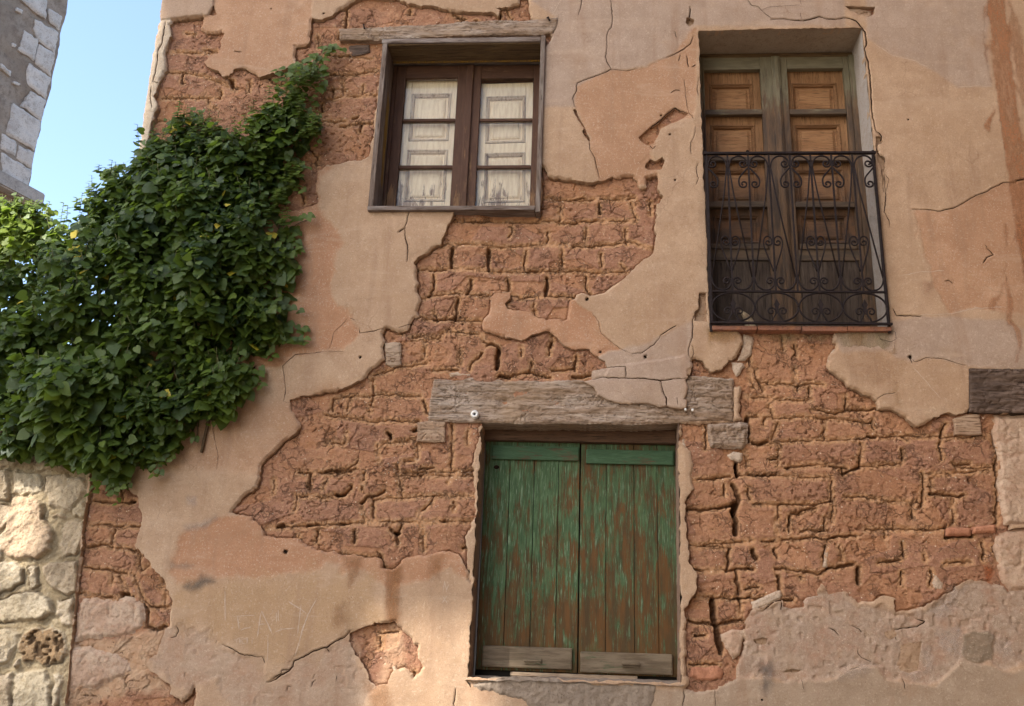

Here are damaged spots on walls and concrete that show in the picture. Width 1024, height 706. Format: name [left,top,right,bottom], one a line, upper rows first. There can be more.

spalling [152,0,531,217]
crack [572,0,633,102]
crack [750,1,890,226]
crack [916,179,1024,212]
spalling [232,160,664,588]
spalling [68,475,196,706]
crack [222,633,349,690]
spalling [350,622,423,686]
spalling [676,333,1011,692]